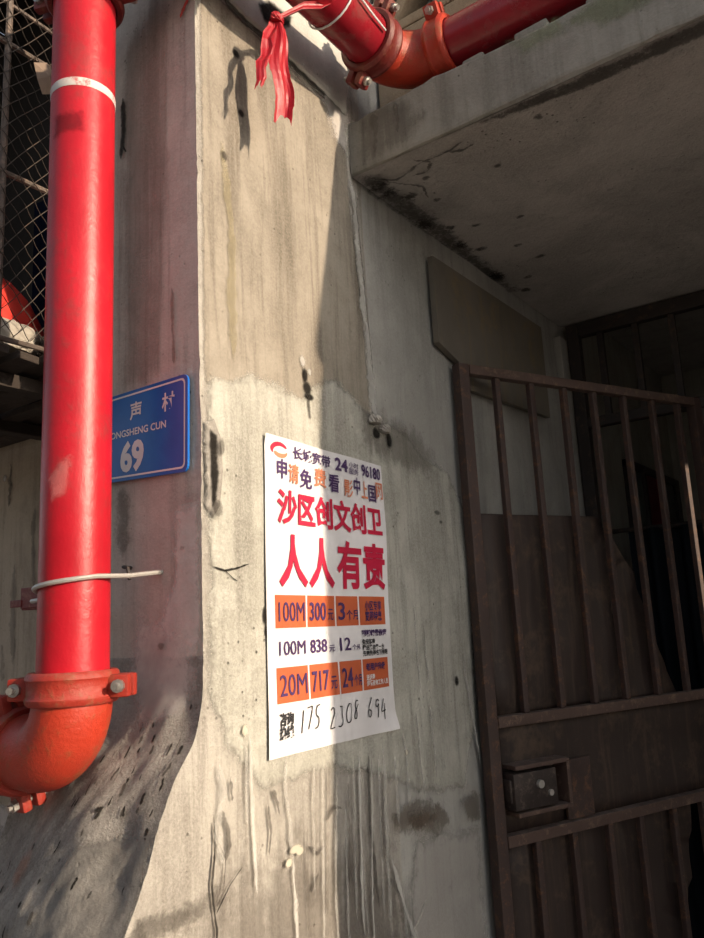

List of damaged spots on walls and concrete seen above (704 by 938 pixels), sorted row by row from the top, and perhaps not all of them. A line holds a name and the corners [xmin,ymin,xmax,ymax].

damp [484,21,704,122]
crack [373,142,473,197]
damp [362,177,531,292]
crack [211,823,242,938]
damp [358,756,379,938]